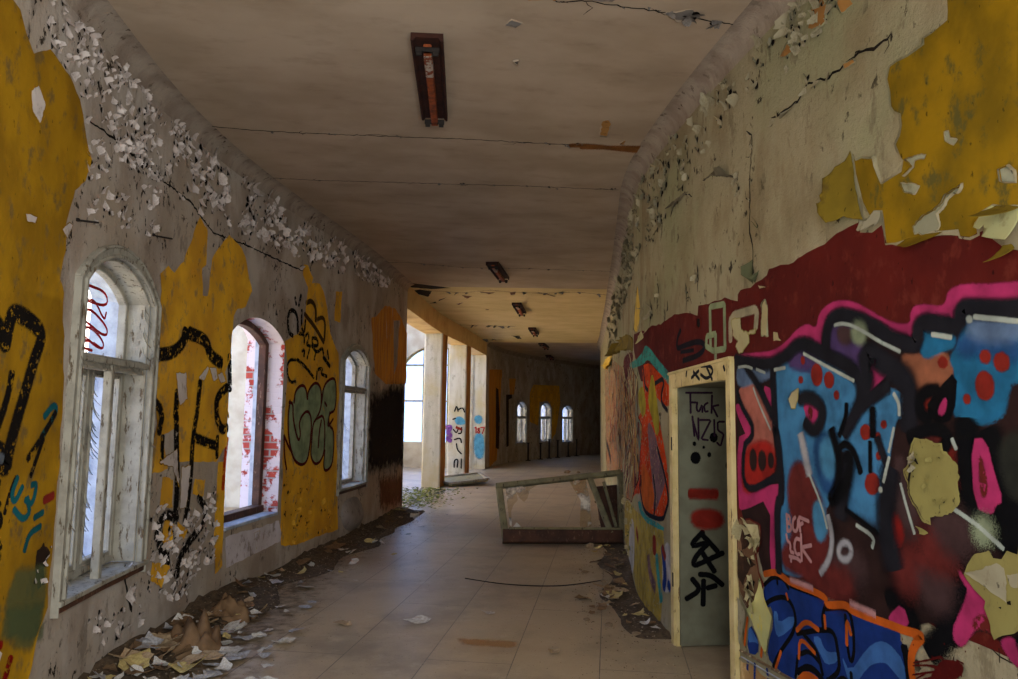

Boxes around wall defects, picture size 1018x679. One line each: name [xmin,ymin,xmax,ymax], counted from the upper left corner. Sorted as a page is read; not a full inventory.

crack [555,0,666,15]
peeling [601,0,854,557]
crack [741,33,891,283]
peeling [816,0,1018,262]
peeling [903,438,960,535]
peeling [964,551,1018,640]